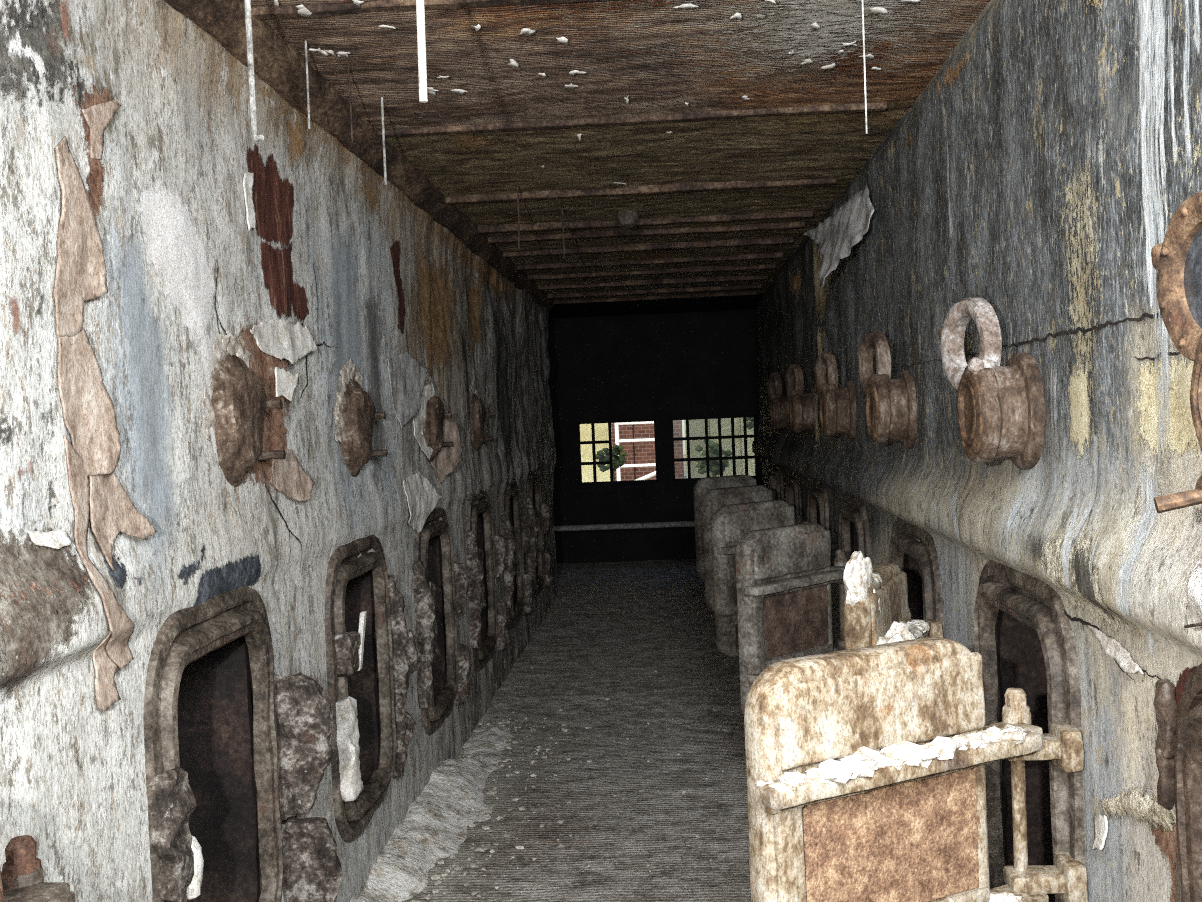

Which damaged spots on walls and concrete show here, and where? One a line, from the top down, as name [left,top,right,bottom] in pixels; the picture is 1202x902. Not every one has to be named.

water stain [943,110,953,238]
peeling [0,0,157,711]
peeling [791,184,874,355]
crack [895,313,1161,369]
water stain [1108,0,1200,662]
crack [1135,352,1180,361]
peeling [177,543,261,608]
water stain [1061,433,1098,594]
crack [1063,609,1161,684]